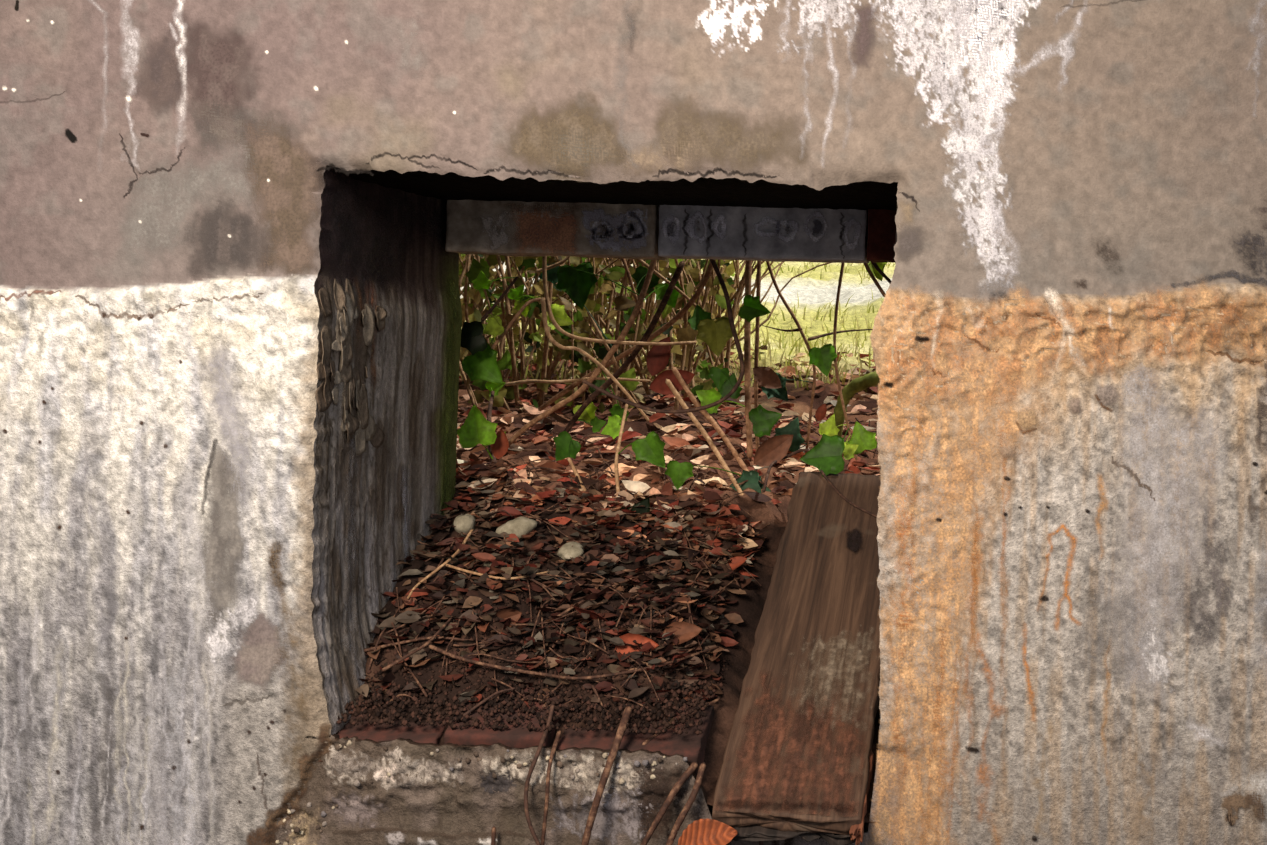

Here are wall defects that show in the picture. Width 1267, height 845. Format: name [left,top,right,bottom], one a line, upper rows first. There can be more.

crack [119,134,182,197]
leakage [129,0,447,291]
leakage [698,0,1081,299]
leakage [1171,233,1267,287]
corrosion [875,288,1267,845]
leakage [97,753,180,845]
leakage [108,597,257,795]
spalling [276,740,688,845]